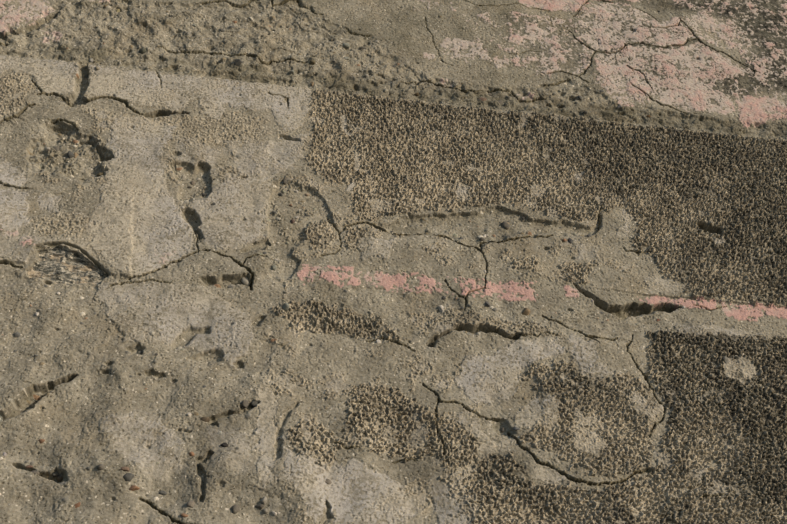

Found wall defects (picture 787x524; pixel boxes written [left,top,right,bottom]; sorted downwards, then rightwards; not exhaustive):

peeling [439,37,492,63]
crack [399,0,758,115]
peeling [503,0,787,128]
crack [0,79,145,131]
flaking render [27,245,108,286]
crack [110,230,267,291]
crack [320,217,554,311]
spalling [563,283,787,323]
spalling [0,373,78,422]
crack [520,315,668,438]
crack [422,382,653,486]
crack [137,496,192,524]